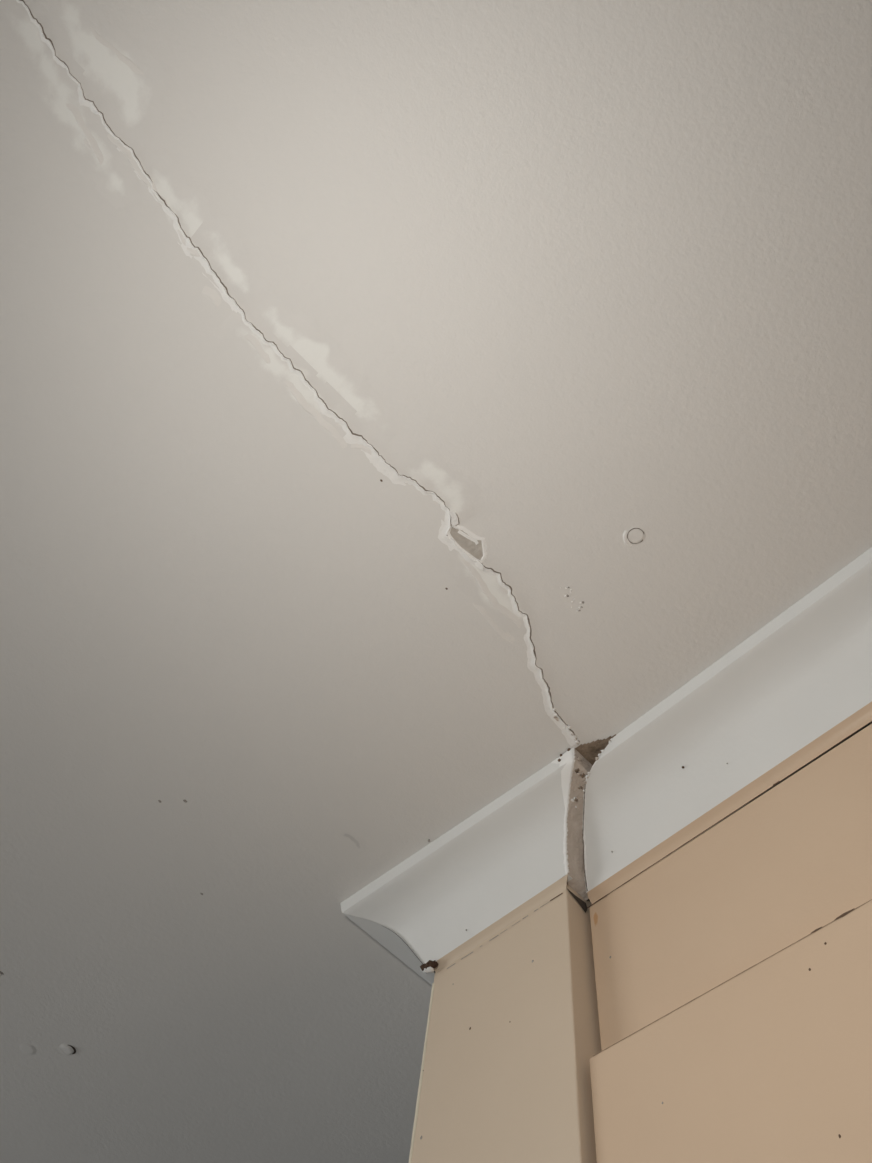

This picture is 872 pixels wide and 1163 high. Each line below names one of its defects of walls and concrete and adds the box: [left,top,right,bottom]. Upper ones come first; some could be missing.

crack [16,0,872,941]
crack [383,926,481,974]